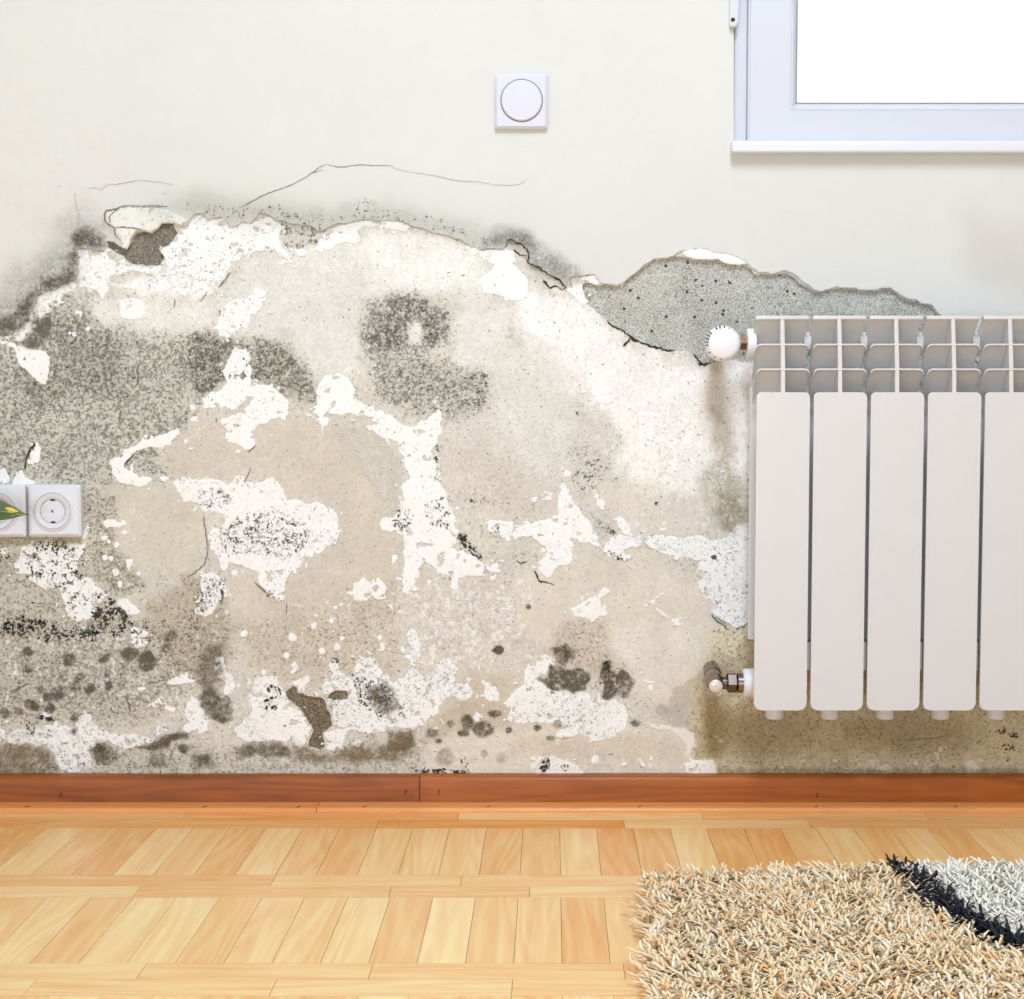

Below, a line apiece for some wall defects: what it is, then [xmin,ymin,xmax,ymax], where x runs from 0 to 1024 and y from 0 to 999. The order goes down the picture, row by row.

crack [242,164,527,207]
leakage [370,298,450,349]
leakage [372,360,488,415]
flaking render [0,207,1024,774]
leakage [198,490,311,559]
leakage [0,537,240,773]
leakage [539,646,632,700]
leakage [242,656,412,762]
leakage [447,711,501,736]
leakage [415,759,470,773]